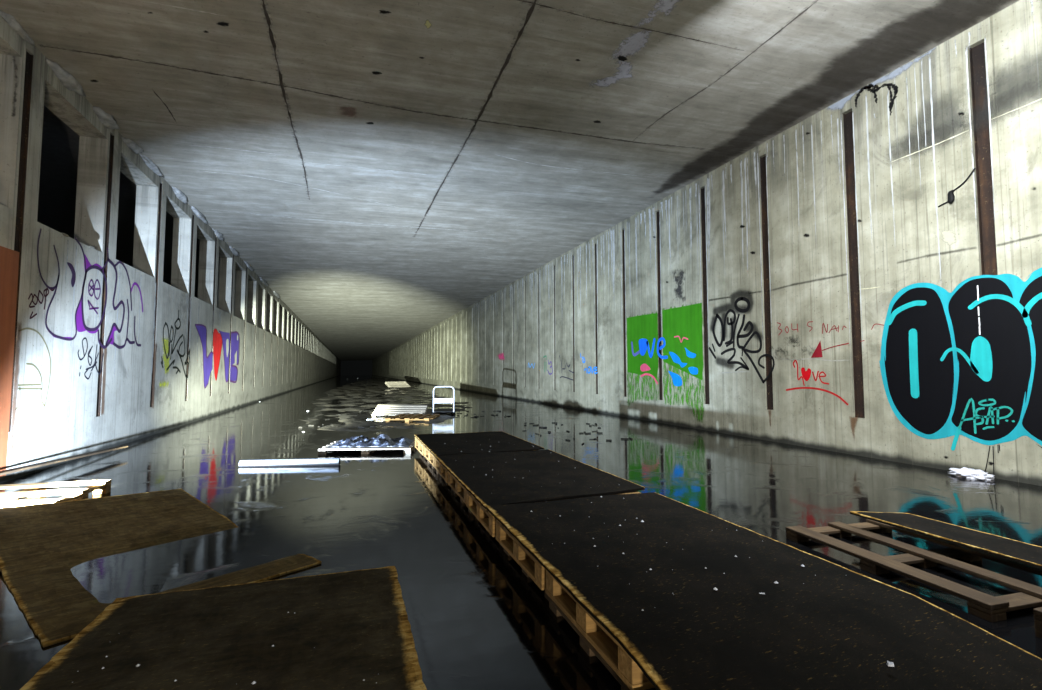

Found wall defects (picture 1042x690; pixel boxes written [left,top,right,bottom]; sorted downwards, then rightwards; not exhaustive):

crack [44,0,818,237]
water stain [510,0,1011,335]